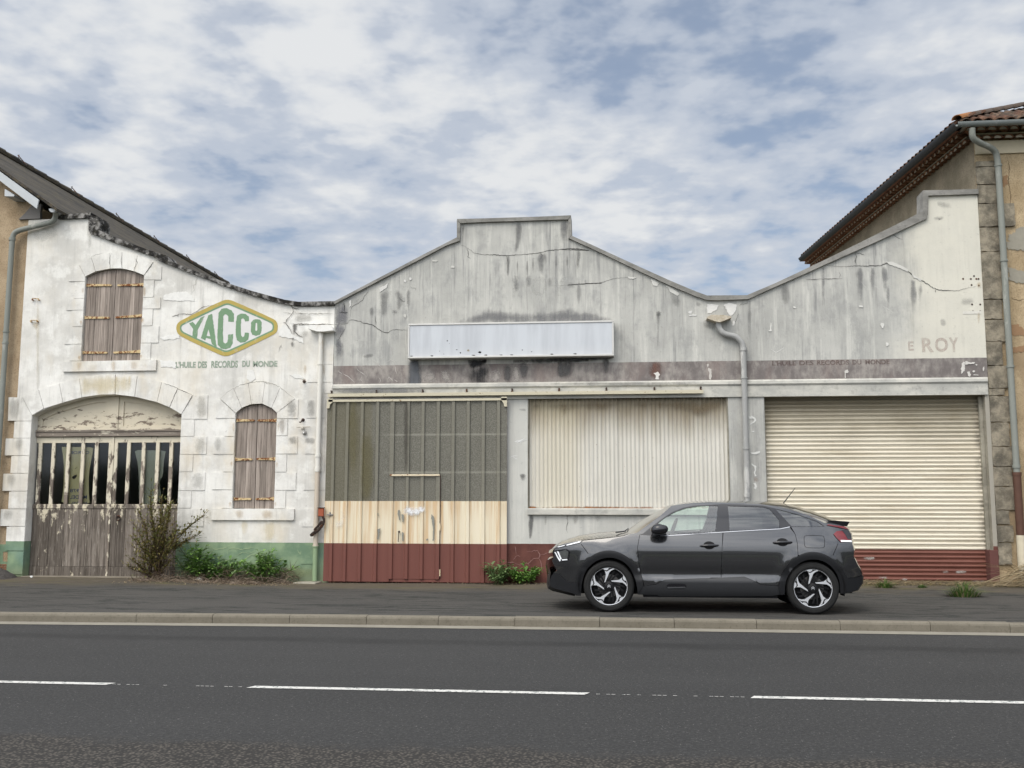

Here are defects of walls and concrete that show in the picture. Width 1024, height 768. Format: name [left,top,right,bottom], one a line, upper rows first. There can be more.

crack [467,248,589,273]
crack [811,253,976,310]
crack [279,292,398,349]
leakage [336,307,346,353]
leakage [473,310,598,322]
peeling [688,303,737,326]
leakage [337,360,421,393]
leakage [468,359,486,383]
leakage [505,357,612,380]